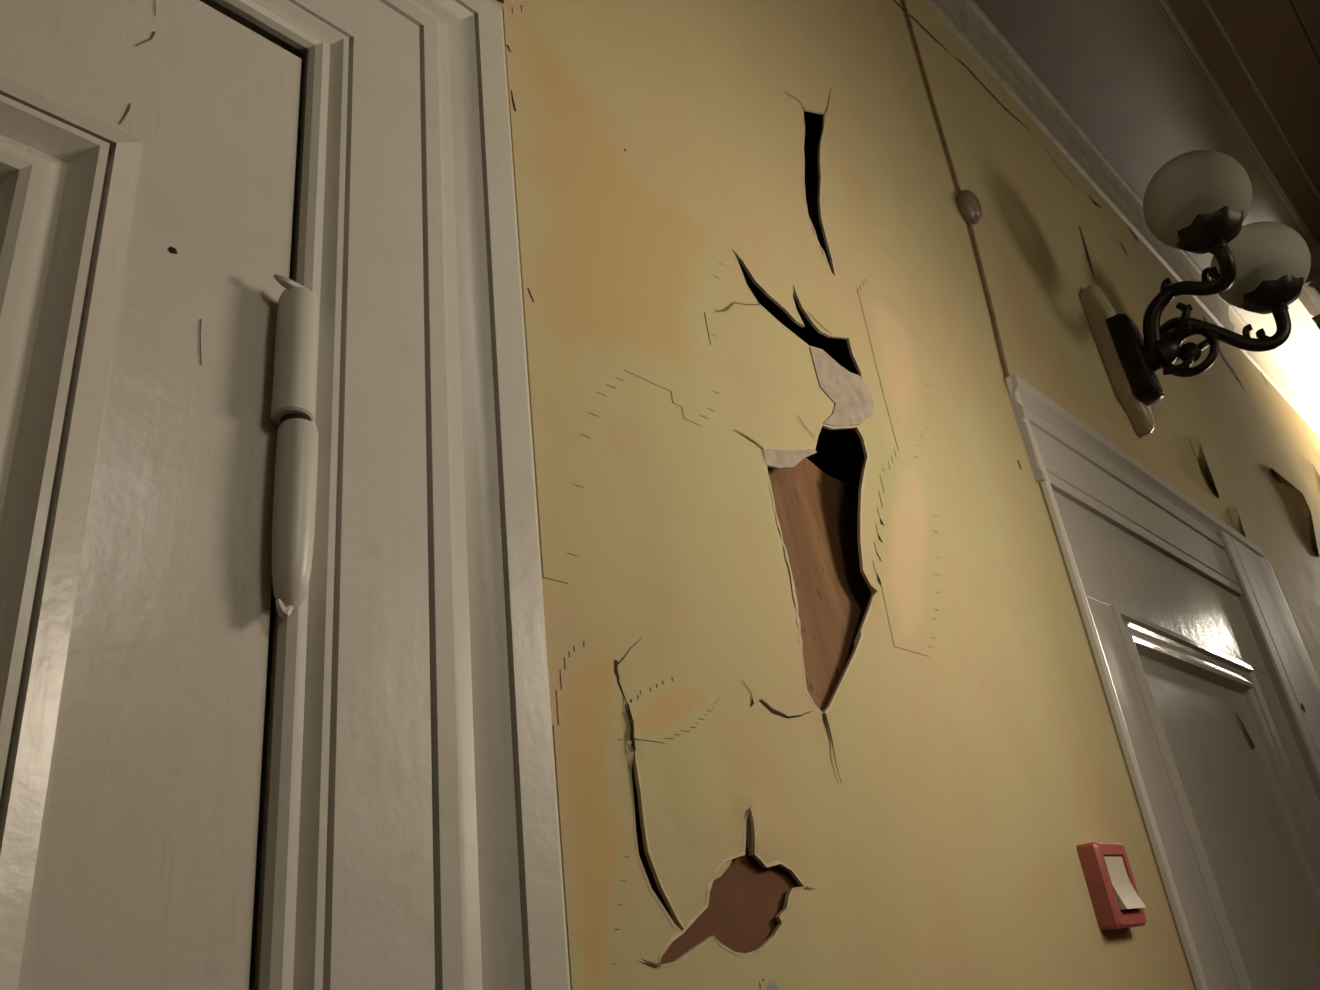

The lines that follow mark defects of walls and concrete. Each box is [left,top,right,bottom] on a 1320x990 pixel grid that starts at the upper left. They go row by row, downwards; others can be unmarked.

spalling [716,247,879,781]
crack [614,638,685,933]
spalling [636,806,815,968]